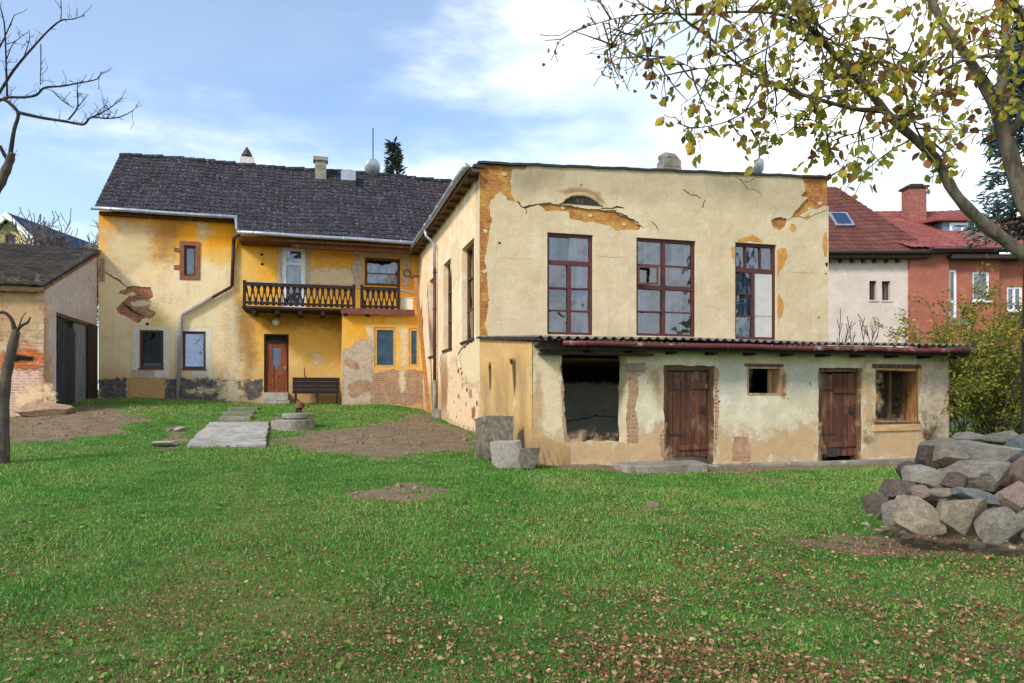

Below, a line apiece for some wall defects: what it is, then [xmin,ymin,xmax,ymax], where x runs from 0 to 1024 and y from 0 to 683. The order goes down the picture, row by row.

spalling [538,203,641,231]
spalling [771,178,827,232]
spalling [117,286,156,325]
spalling [450,165,525,392]
spalling [731,235,763,261]
spalling [777,248,788,277]
peeling [98,293,264,402]
spalling [370,328,423,406]
spalling [626,363,648,443]